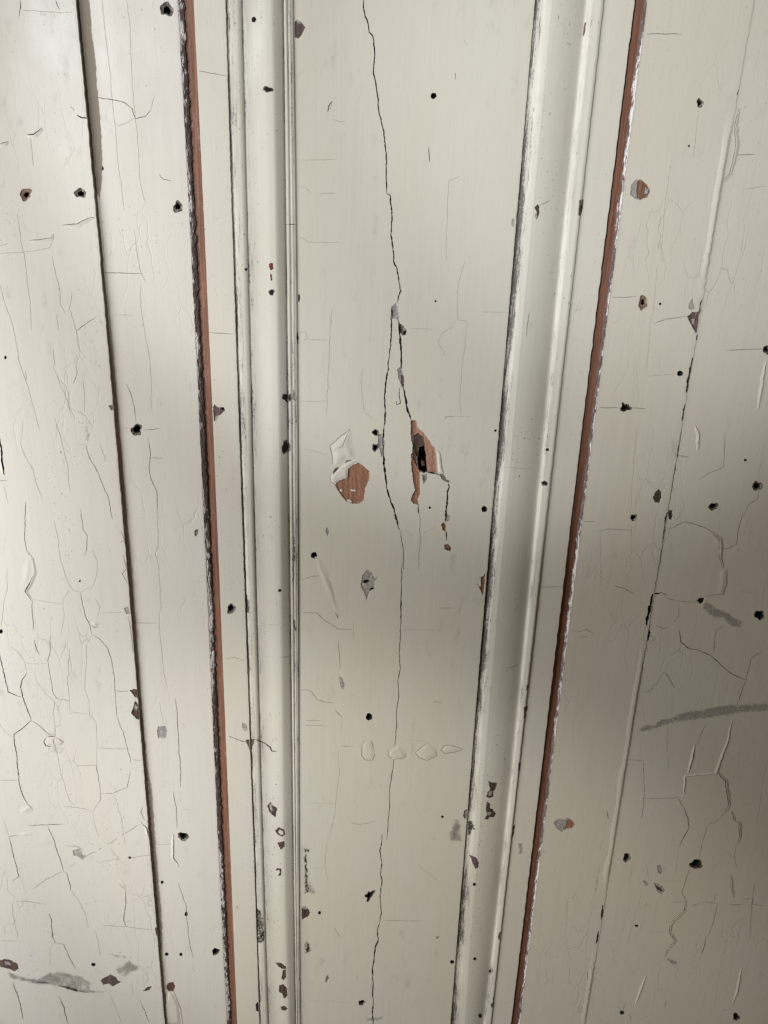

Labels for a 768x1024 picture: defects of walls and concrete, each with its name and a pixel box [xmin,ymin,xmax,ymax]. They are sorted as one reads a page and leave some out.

crack [0,128,43,166]
crack [70,2,155,206]
crack [724,92,765,189]
peeling [330,458,370,504]
crack [302,0,467,1024]
spalling [410,420,450,508]
spalling [517,0,651,1024]
crack [0,214,194,970]
peeling [361,570,379,599]
crack [584,111,767,1017]
peeling [0,959,19,972]
peeling [101,975,121,987]